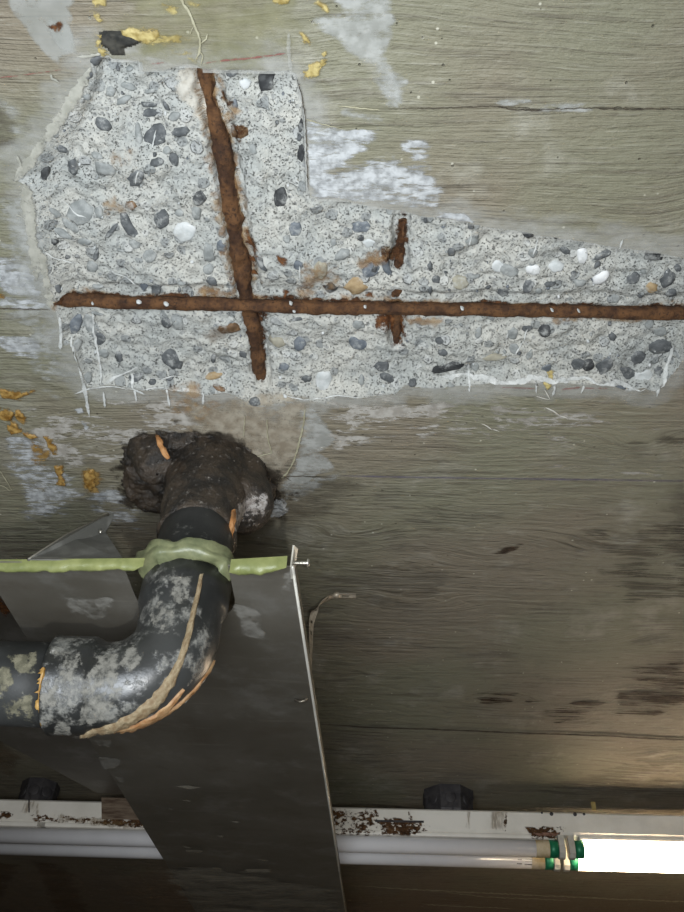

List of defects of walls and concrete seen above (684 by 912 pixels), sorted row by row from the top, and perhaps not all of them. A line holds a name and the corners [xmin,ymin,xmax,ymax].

spalling [18,31,684,468]
rust [53,66,684,382]
leakage [302,122,473,223]
leakage [171,394,334,529]